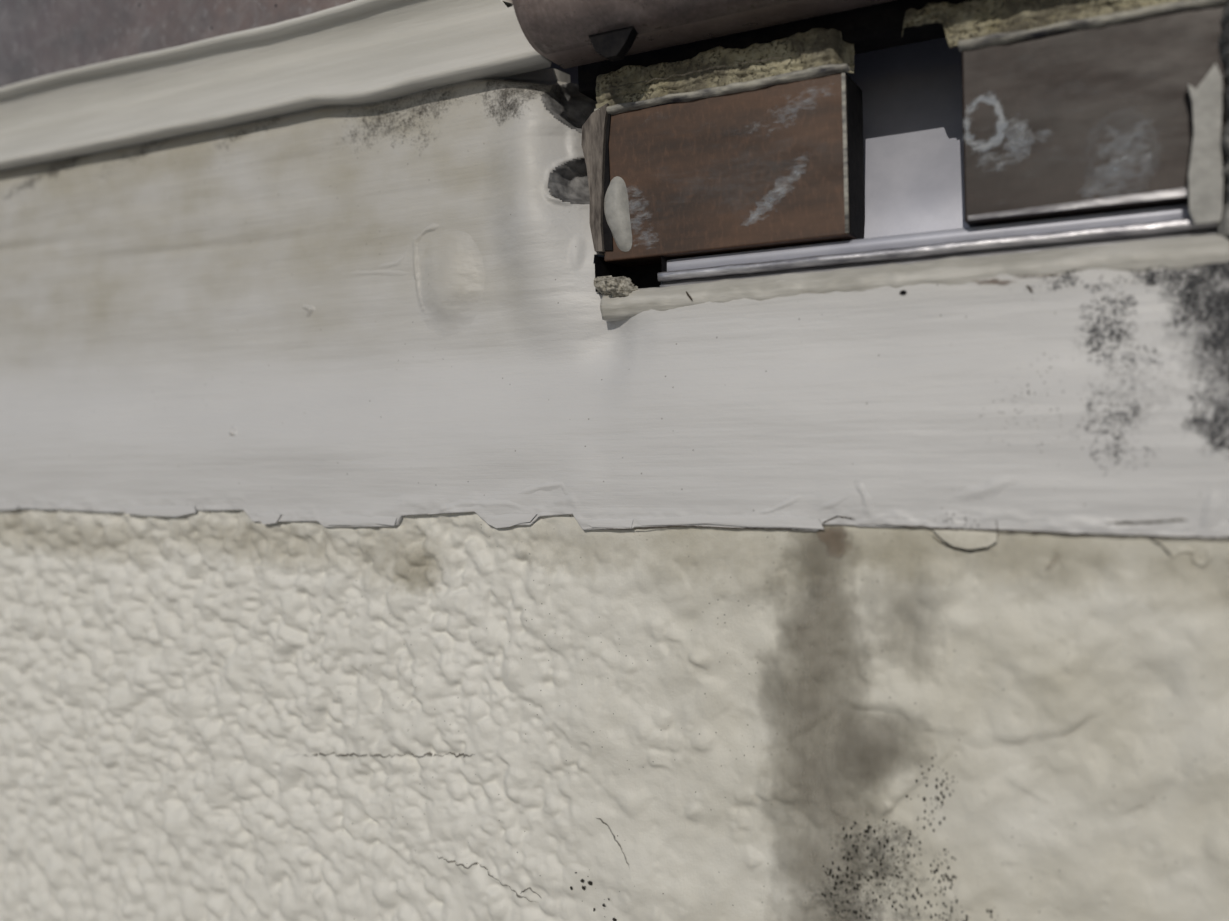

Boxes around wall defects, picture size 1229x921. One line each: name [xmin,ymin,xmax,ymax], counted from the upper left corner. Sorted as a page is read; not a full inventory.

damp [1054,270,1156,368]
damp [1119,262,1229,451]
peeling [320,516,397,526]
peeling [488,513,537,528]
peeling [587,515,824,529]
peeling [934,530,997,549]
damp [777,533,968,921]